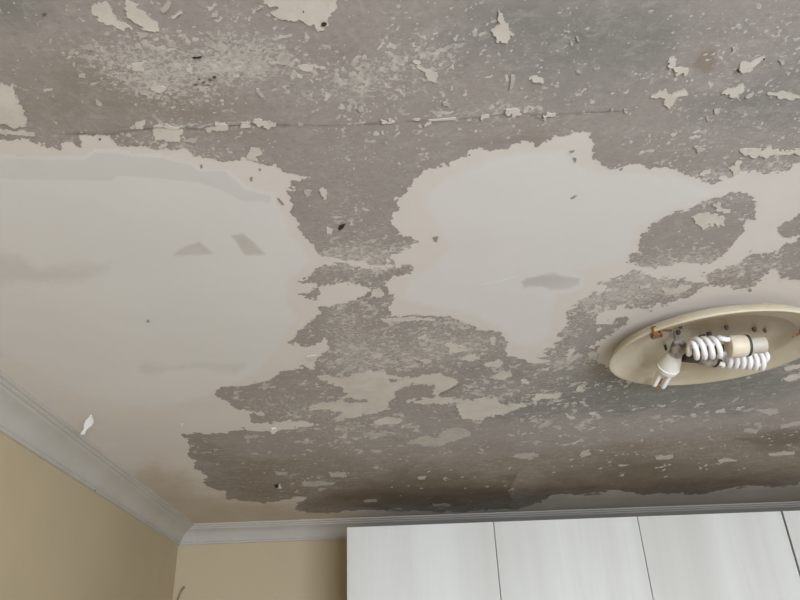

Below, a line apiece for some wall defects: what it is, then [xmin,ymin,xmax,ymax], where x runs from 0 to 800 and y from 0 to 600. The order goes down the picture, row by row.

crack [68,118,286,135]
peeling [0,0,800,269]
crack [347,108,630,127]
leakage [515,268,585,295]
peeling [181,237,800,504]
peeling [80,415,94,435]